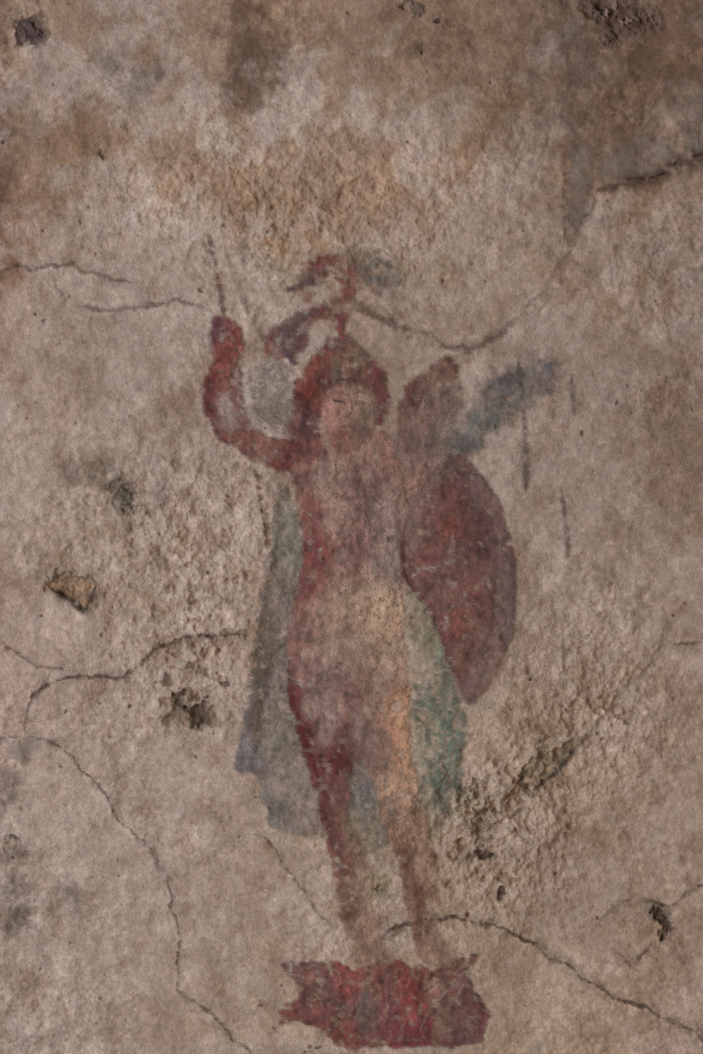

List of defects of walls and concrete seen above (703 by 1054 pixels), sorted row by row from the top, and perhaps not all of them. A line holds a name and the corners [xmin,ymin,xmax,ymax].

spalling [44,568,98,610]
crack [1,629,240,740]
spalling [160,661,216,730]
spalling [645,902,673,944]
crack [385,915,701,1037]